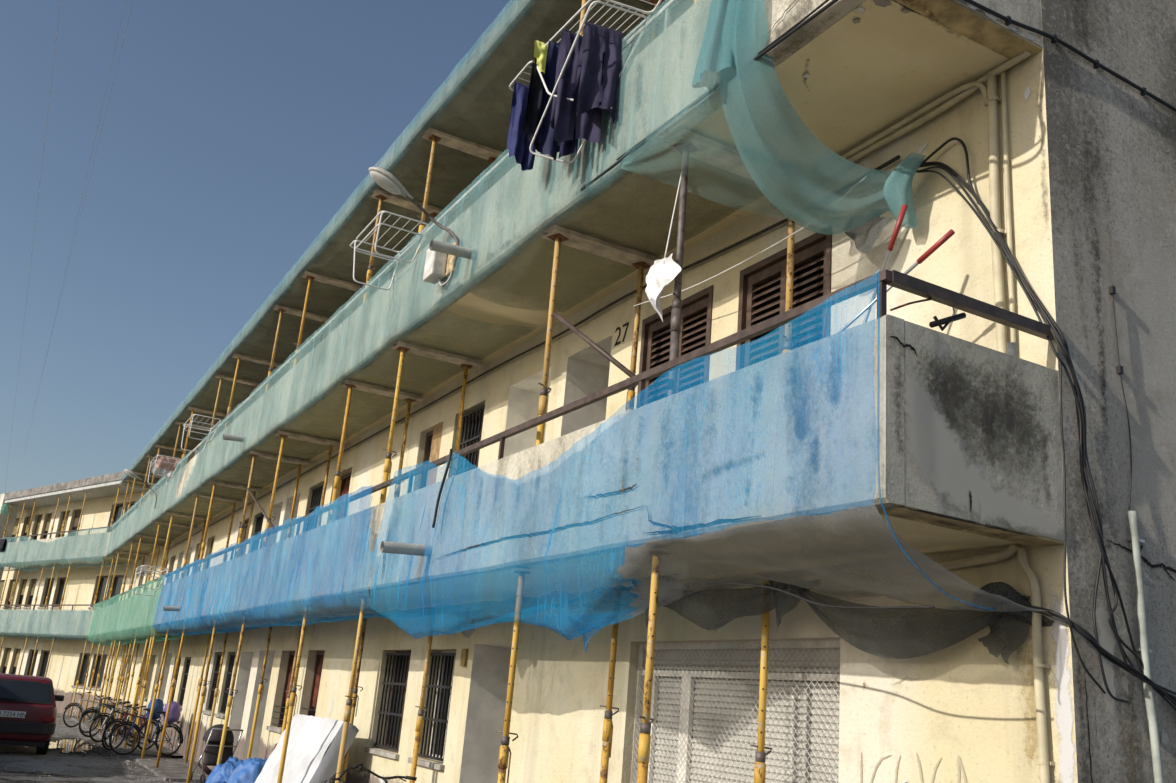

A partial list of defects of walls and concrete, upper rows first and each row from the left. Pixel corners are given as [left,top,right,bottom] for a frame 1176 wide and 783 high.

water stain [919,355,1050,497]
crack [1107,540,1176,581]